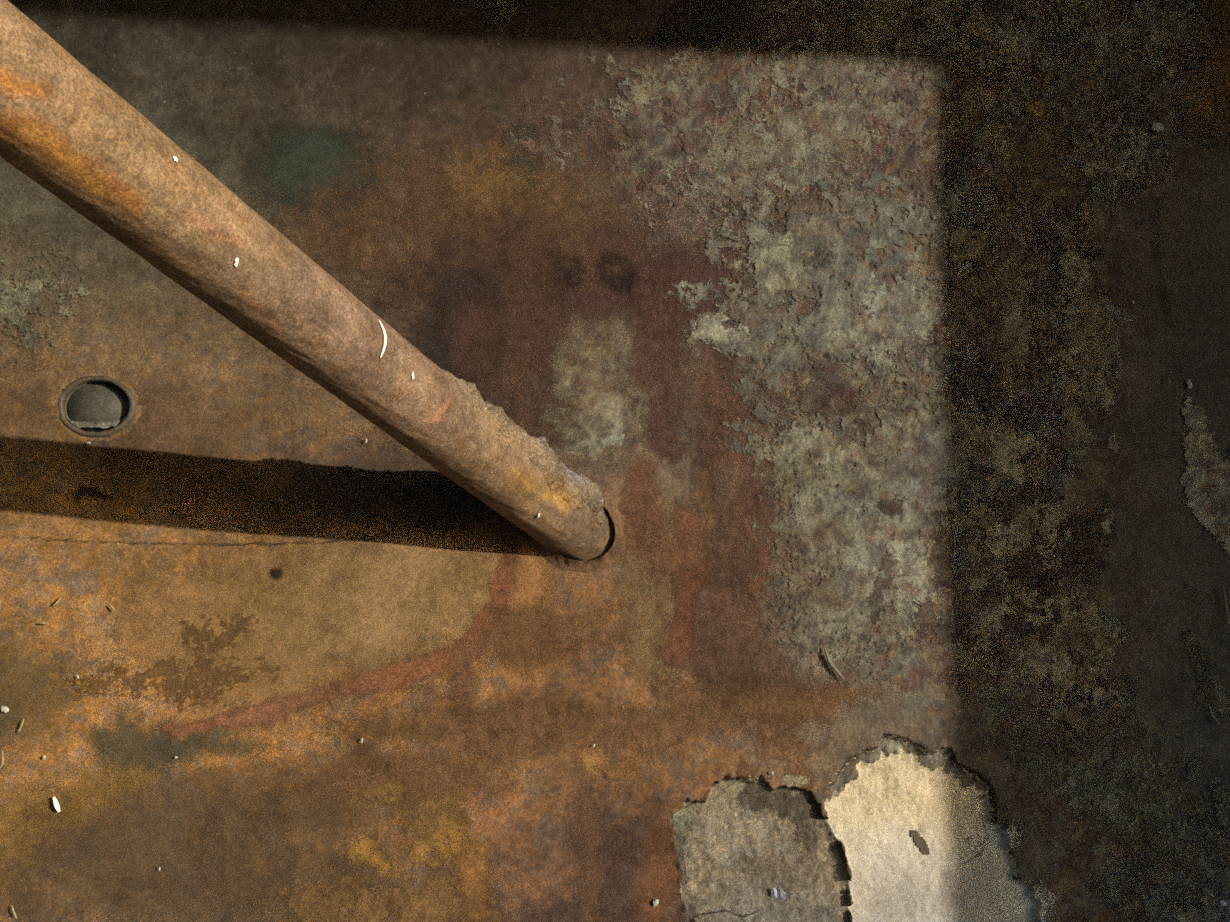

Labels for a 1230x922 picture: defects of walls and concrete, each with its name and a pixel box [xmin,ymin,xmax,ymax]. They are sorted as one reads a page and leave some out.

corrosion [1175,0,1230,144]
corrosion [162,524,557,737]
corrosion [611,344,802,721]
peeling [504,0,1230,922]
corrosion [251,766,696,922]
corrosion [576,741,640,780]